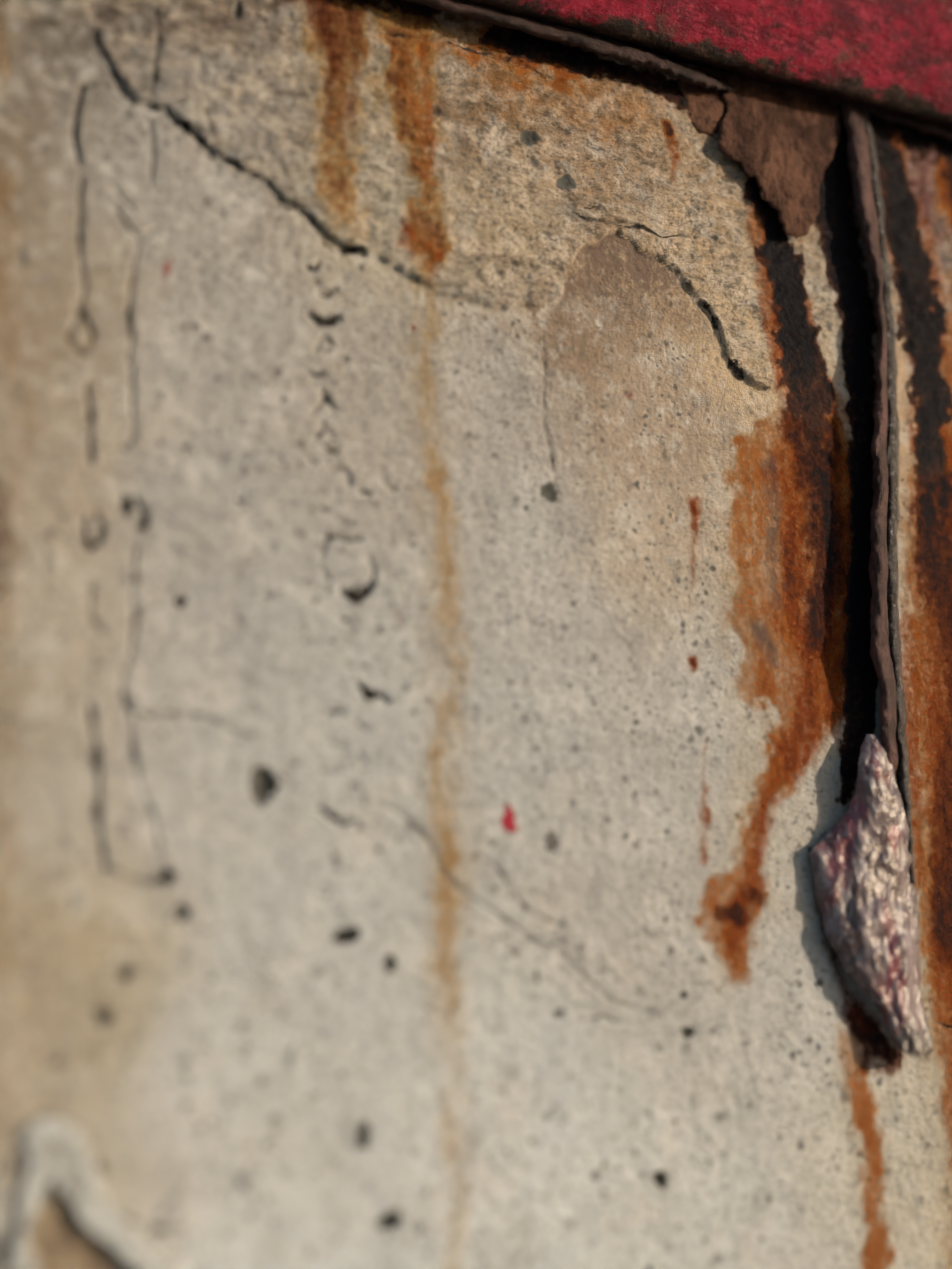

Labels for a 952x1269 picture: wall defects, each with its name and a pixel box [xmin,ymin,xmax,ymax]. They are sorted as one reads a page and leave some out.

crack [94,9,367,255]
crack [390,34,491,56]
rust [304,0,599,273]
crack [575,205,678,238]
peeling [561,232,745,381]
rust [662,119,679,165]
rust [935,157,952,227]
peeling [677,66,933,1057]
rust [695,408,853,981]
rust [900,446,952,1129]
spalling [0,1114,189,1269]
rust [827,944,903,1269]